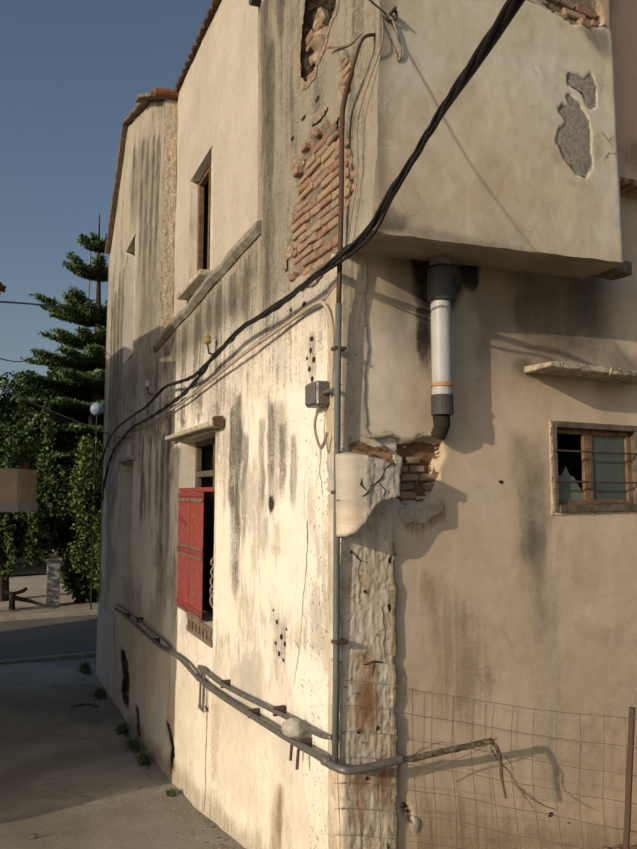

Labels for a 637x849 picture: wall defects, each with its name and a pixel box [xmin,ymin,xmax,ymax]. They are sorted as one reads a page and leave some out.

spalling [297,0,346,90]
spalling [538,0,605,29]
flaking render [555,72,603,177]
spalling [283,95,356,286]
leakage [412,260,431,357]
leakage [450,263,479,304]
leakage [230,416,248,525]
spalling [348,431,446,524]
crack [356,606,387,695]